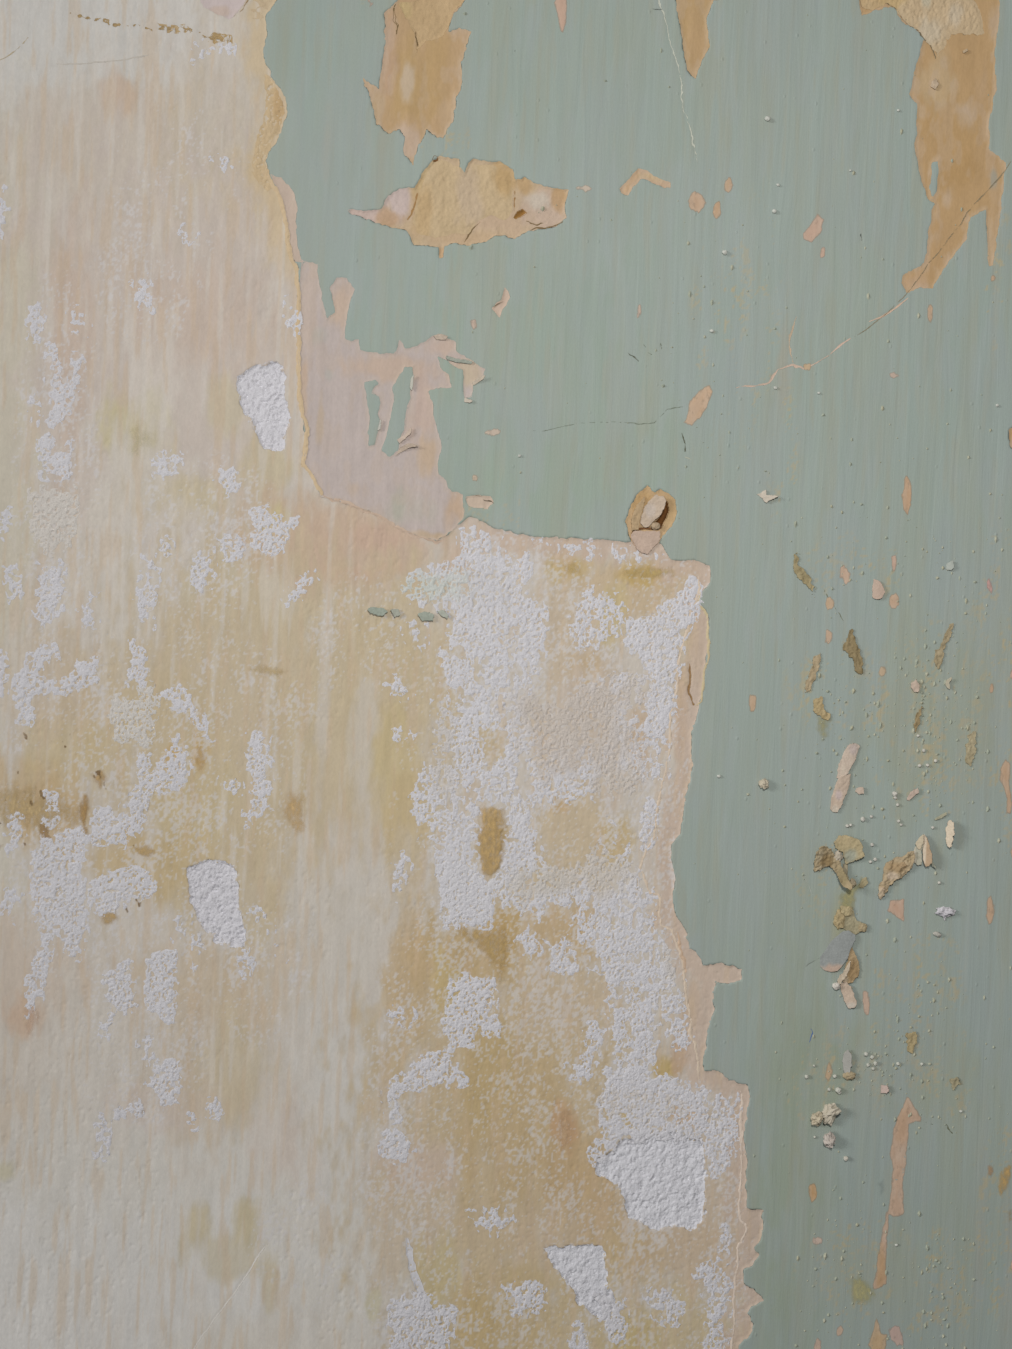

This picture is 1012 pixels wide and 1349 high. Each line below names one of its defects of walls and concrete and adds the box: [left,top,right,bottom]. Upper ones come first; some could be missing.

peeling [348,0,591,258]
peeling [676,0,714,79]
peeling [859,0,1006,293]
crack [737,161,1011,388]
flaking render [190,502,300,593]
flaking render [0,638,216,1020]
flaking render [217,730,275,830]
flaking render [236,174,743,1231]
damp [479,808,503,875]
flaking render [97,859,289,1045]
flaking render [385,1291,459,1349]
flaking render [499,1244,686,1349]